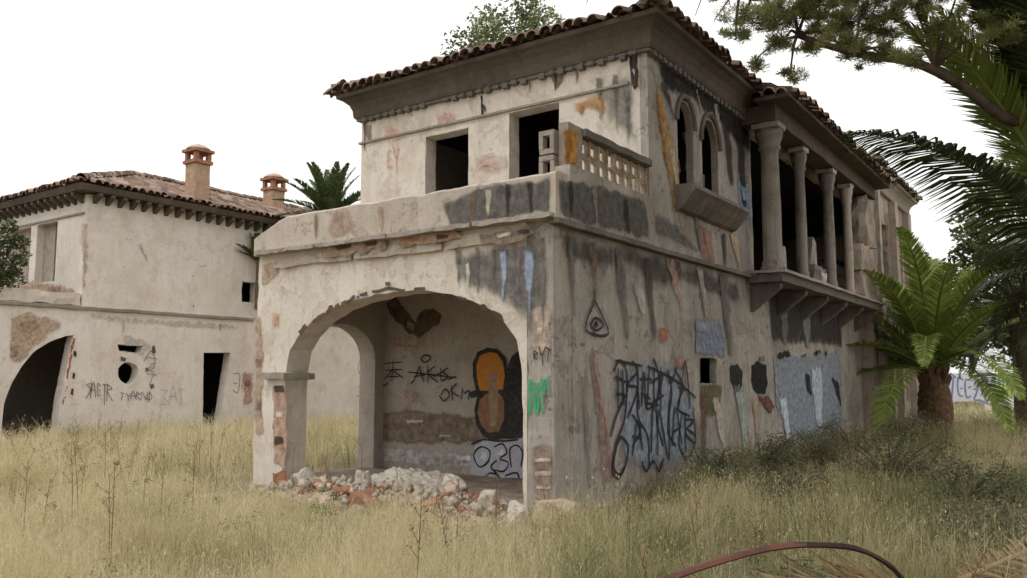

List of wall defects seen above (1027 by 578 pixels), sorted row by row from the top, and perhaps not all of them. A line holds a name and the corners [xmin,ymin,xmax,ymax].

flaking render [10,313,60,361]
flaking render [298,282,441,338]
flaking render [243,313,288,485]
flaking render [382,410,488,469]